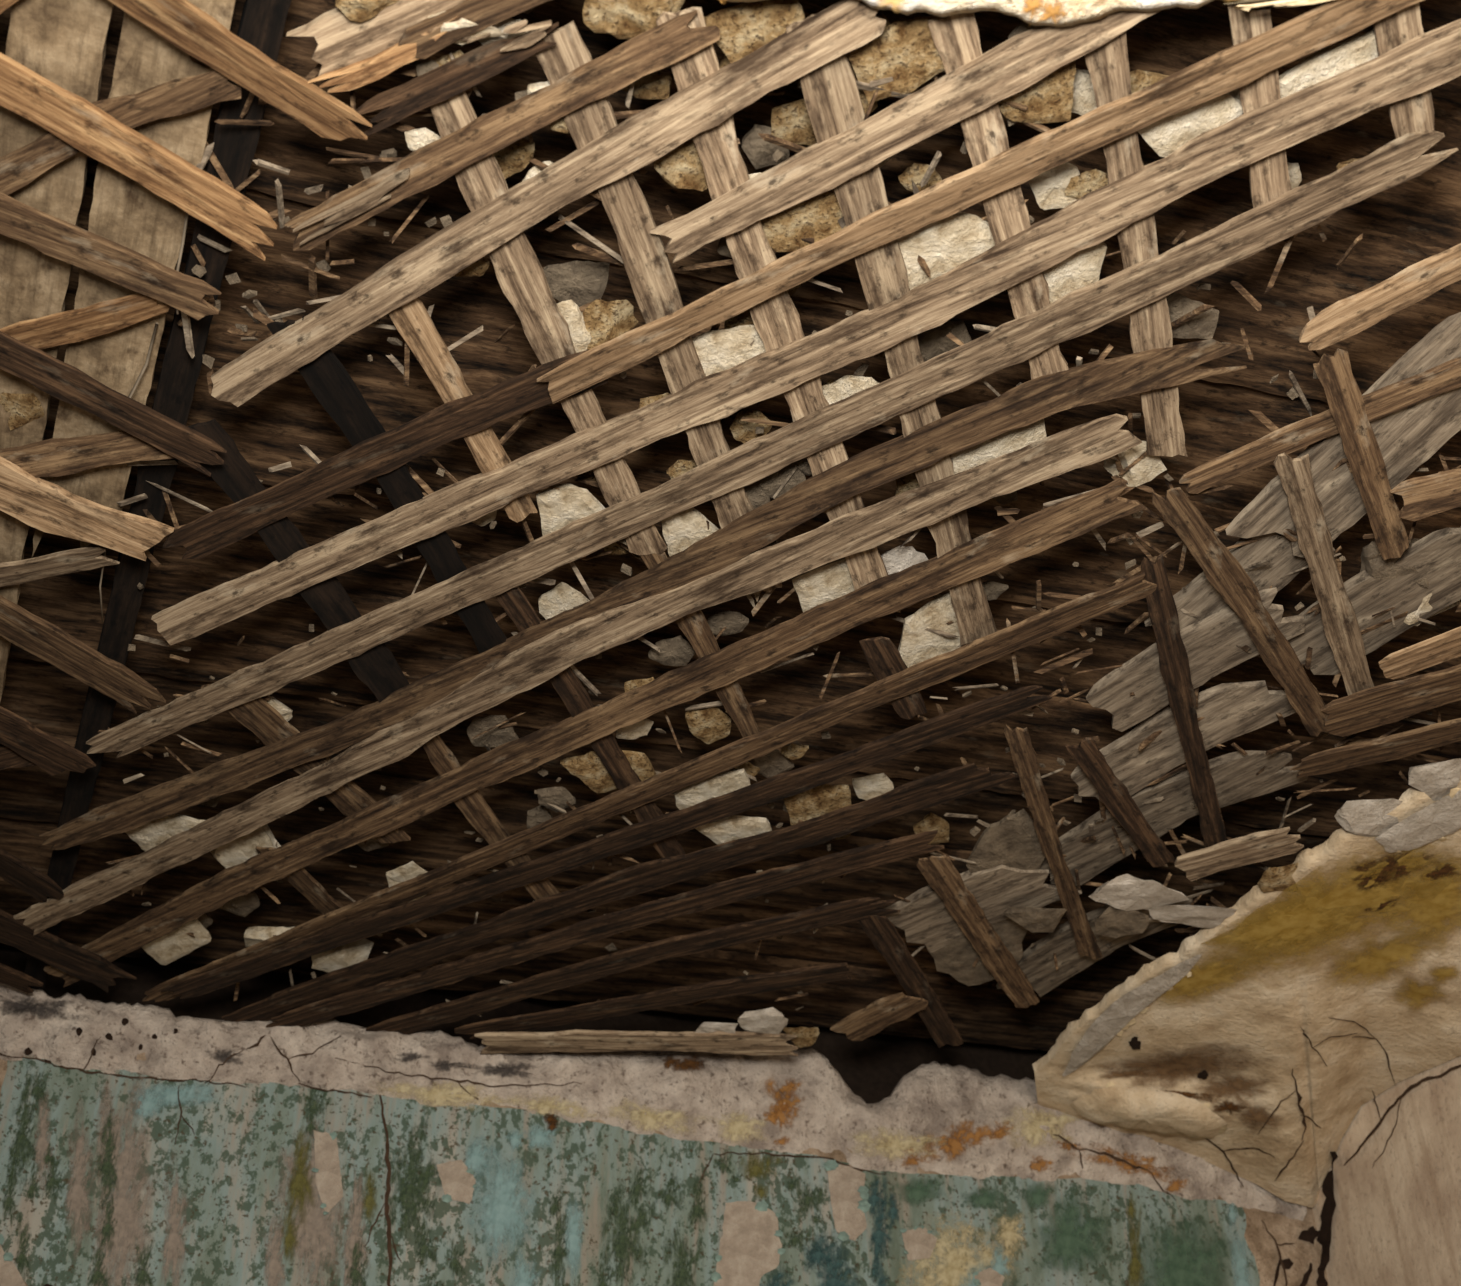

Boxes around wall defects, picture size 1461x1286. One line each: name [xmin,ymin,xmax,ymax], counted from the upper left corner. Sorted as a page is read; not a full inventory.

flaking render [1226,0,1331,11]
flaking render [1354,787,1461,911]
water stain [1162,847,1461,1008]
spalling [76,1018,129,1056]
water stain [1102,1046,1276,1129]
peeling [0,1234,26,1286]
crack [0,1035,582,1286]
peeling [311,1130,343,1215]
peeling [436,1159,477,1204]
peeling [711,1200,786,1286]
peeling [824,1159,871,1242]
crack [1205,1017,1461,1286]